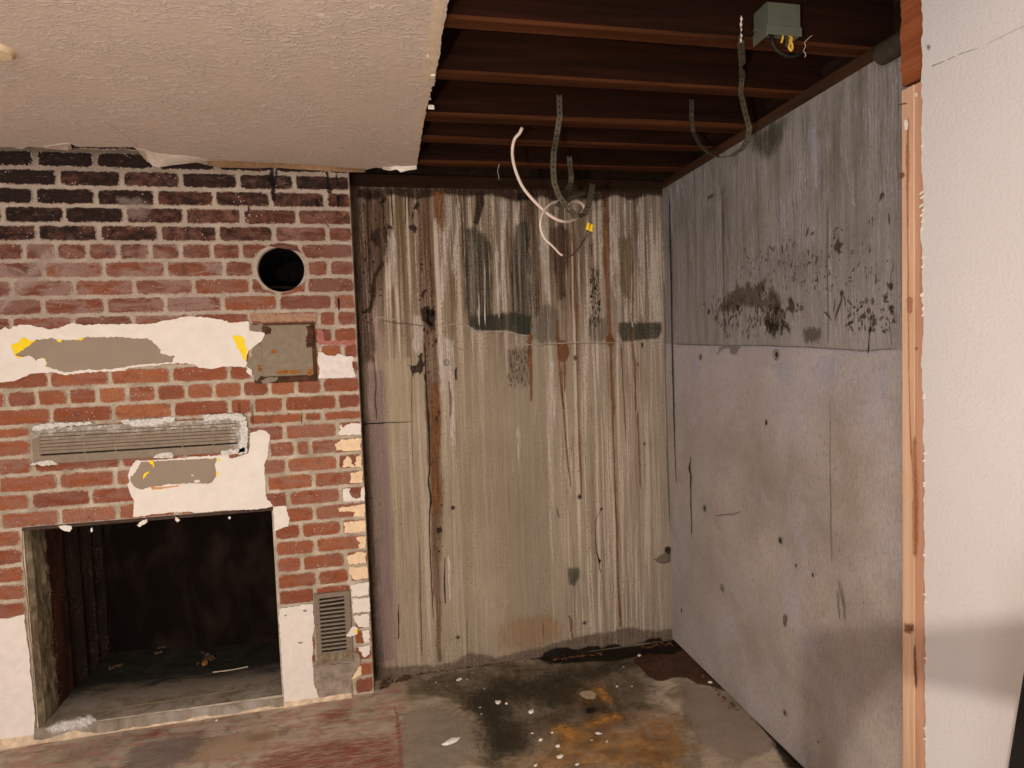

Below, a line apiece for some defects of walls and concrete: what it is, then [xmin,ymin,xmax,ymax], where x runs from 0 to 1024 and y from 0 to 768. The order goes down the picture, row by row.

peeling [0,316,272,382]
peeling [127,430,290,531]
peeling [305,325,356,378]
peeling [335,423,370,680]
corrosion [418,191,443,661]
water stain [351,183,725,764]
corrosion [557,224,582,497]
corrosion [511,684,689,768]